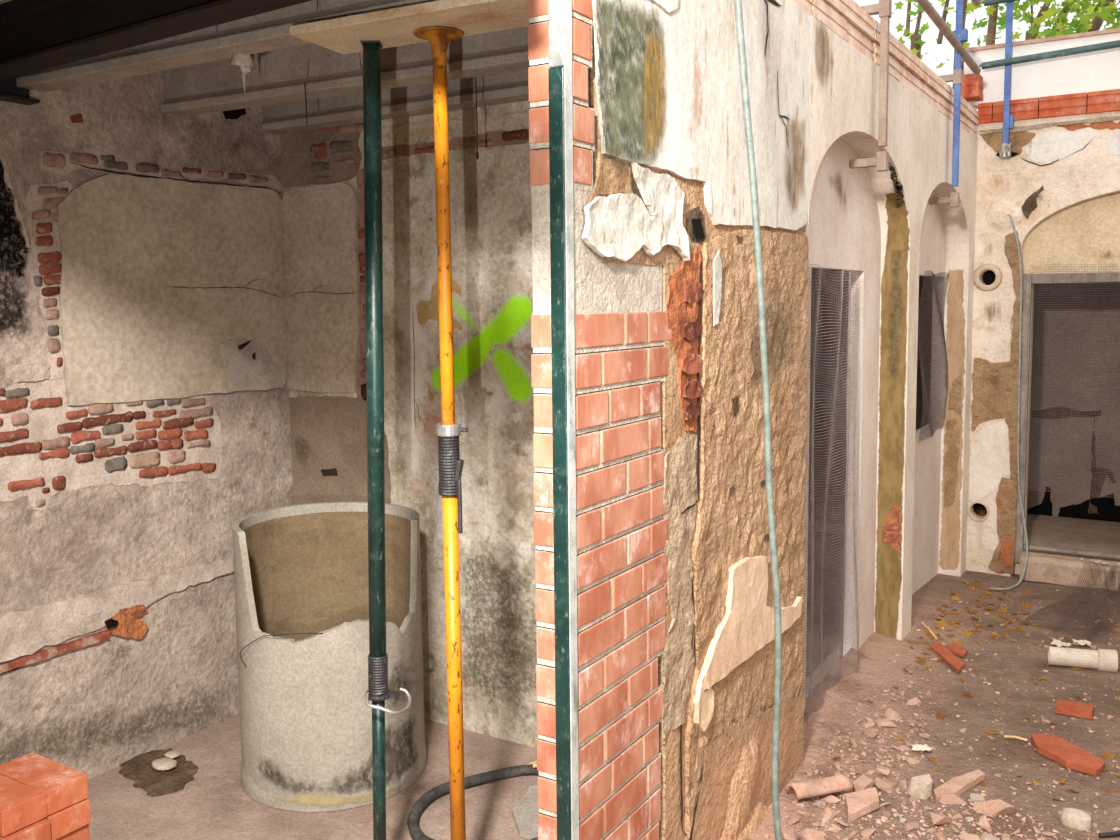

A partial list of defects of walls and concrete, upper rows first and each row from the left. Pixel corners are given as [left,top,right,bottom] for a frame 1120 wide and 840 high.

flaking render [382,142,435,160]
flaking render [448,128,529,151]
damp [592,0,665,164]
spalling [1021,185,1044,219]
flaking render [0,123,367,510]
crack [170,279,354,299]
peeling [582,157,706,433]
spalling [943,231,1023,574]